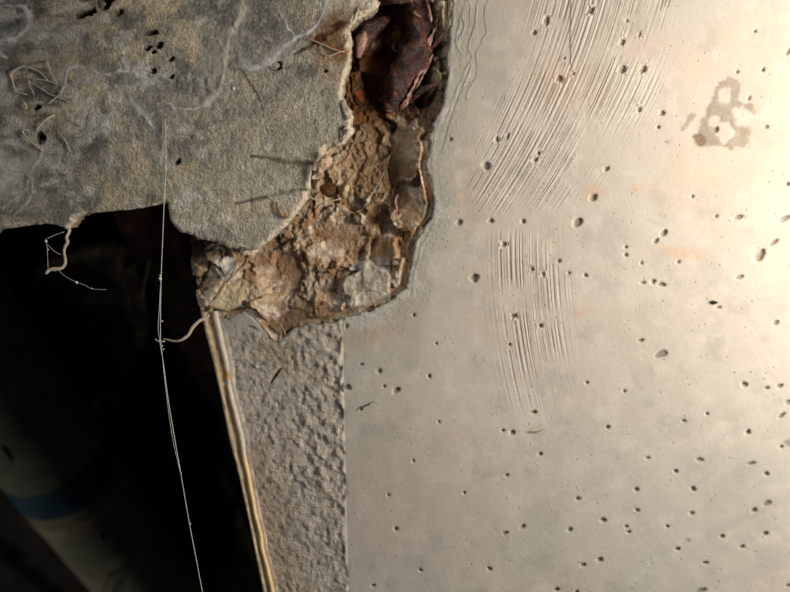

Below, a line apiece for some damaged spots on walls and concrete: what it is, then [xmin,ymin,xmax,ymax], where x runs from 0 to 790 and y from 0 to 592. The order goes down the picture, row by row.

spalling [189,0,453,342]
rust [293,0,445,115]
damp [683,79,754,149]